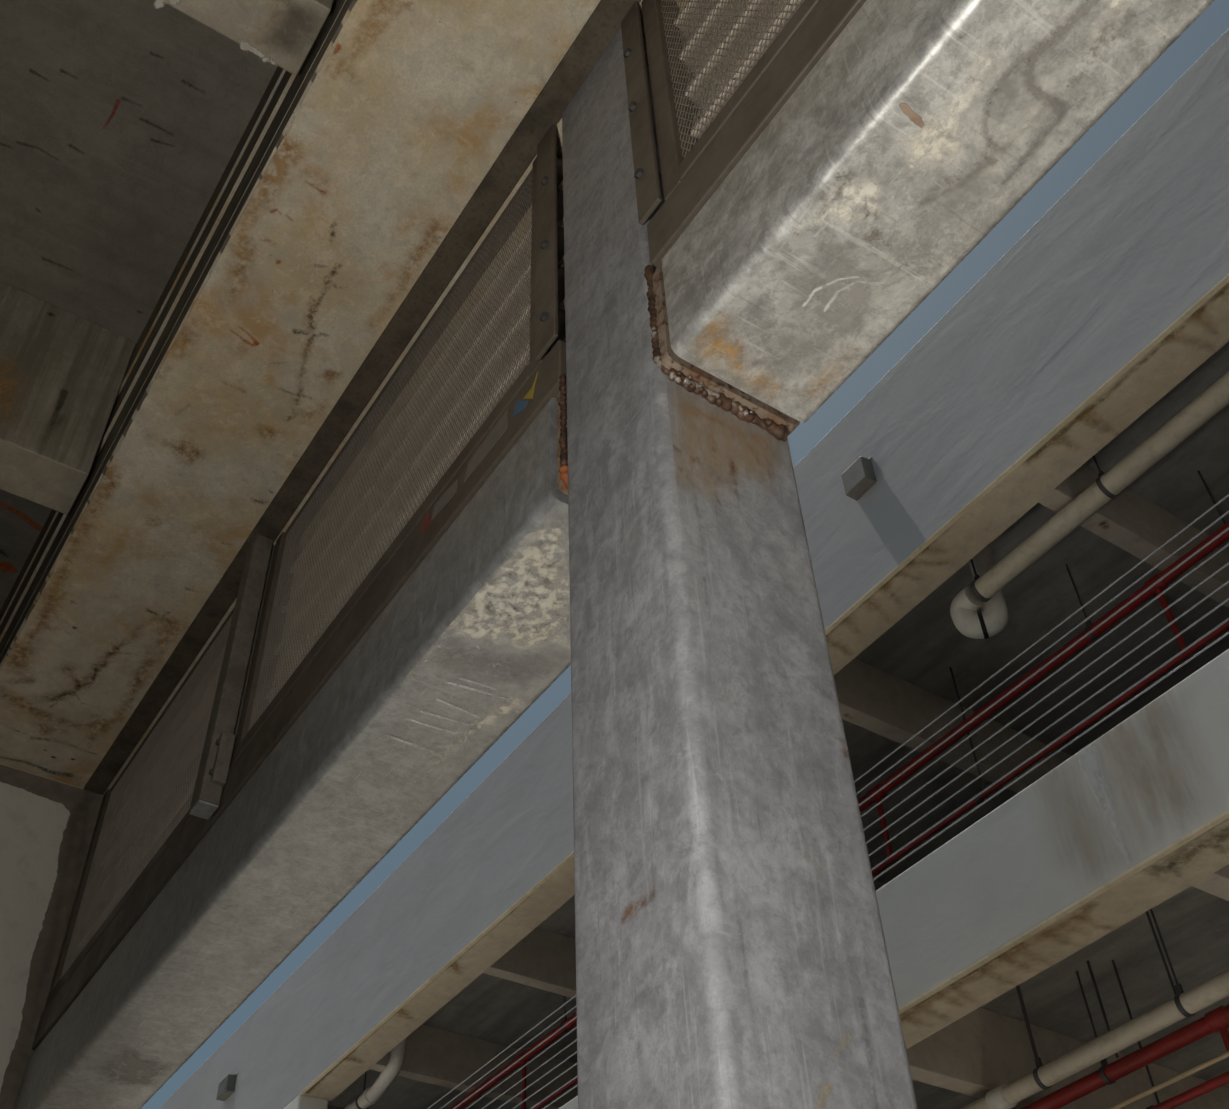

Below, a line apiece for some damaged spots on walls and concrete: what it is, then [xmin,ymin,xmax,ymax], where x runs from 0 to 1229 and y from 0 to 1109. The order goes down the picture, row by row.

leakage [942,0,1100,199]